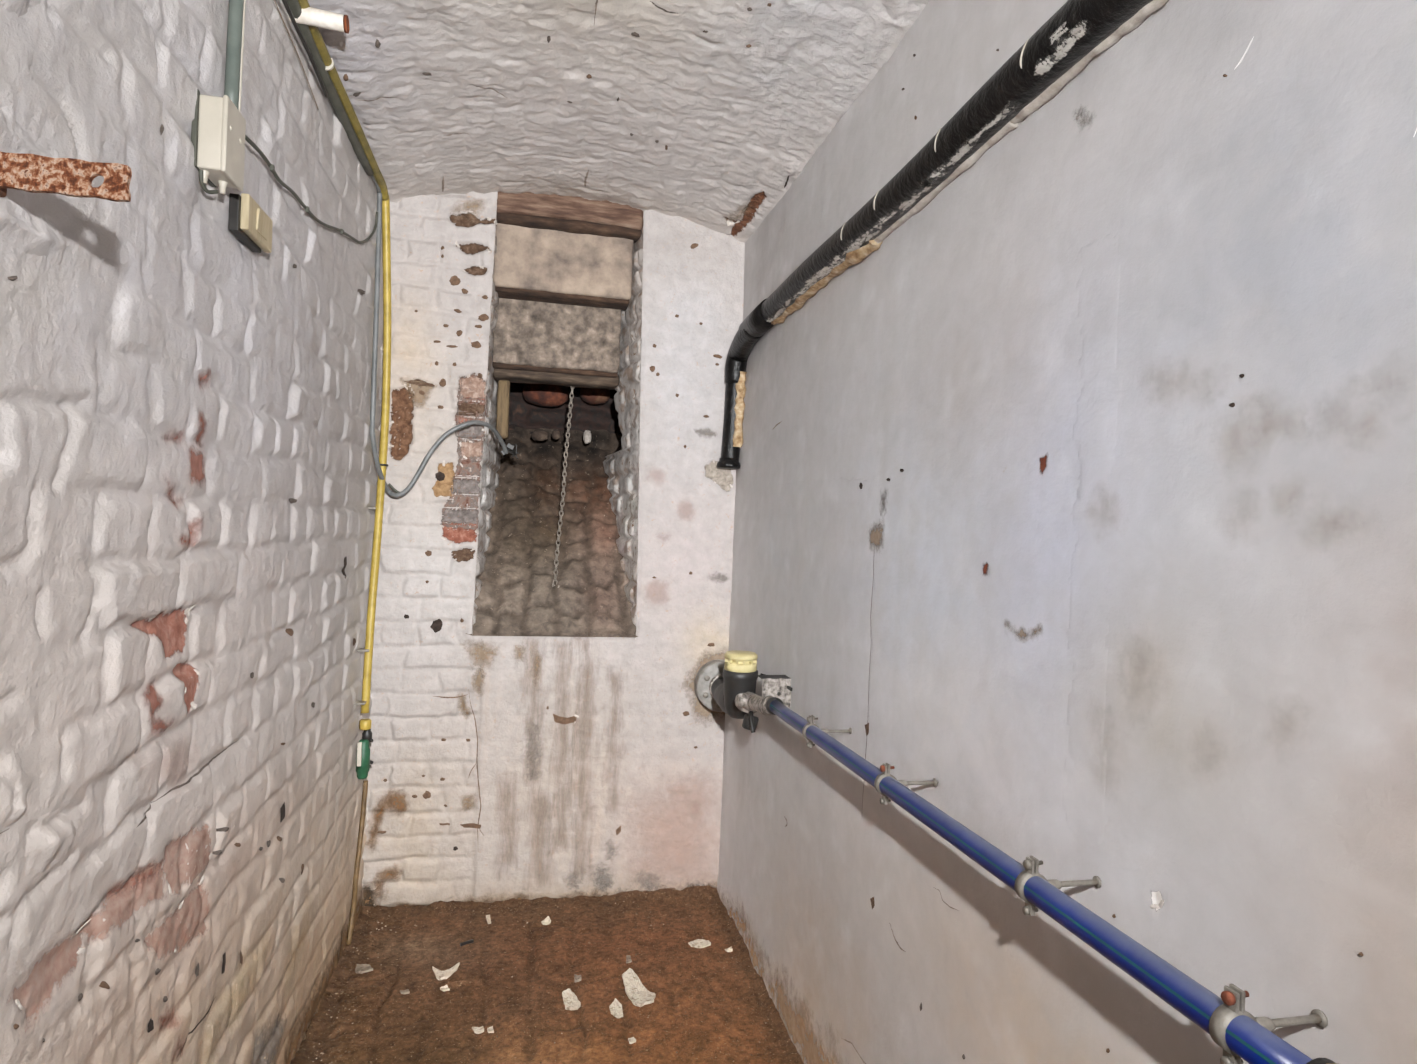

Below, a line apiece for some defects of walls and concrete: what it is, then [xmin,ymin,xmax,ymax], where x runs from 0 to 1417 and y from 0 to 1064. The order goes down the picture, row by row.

spalling [725,191,767,237]
spalling [388,379,434,460]
spalling [432,373,488,562]
spalling [131,604,201,712]
leakage [516,648,540,677]
leakage [561,845,614,898]
peeling [13,824,212,1019]